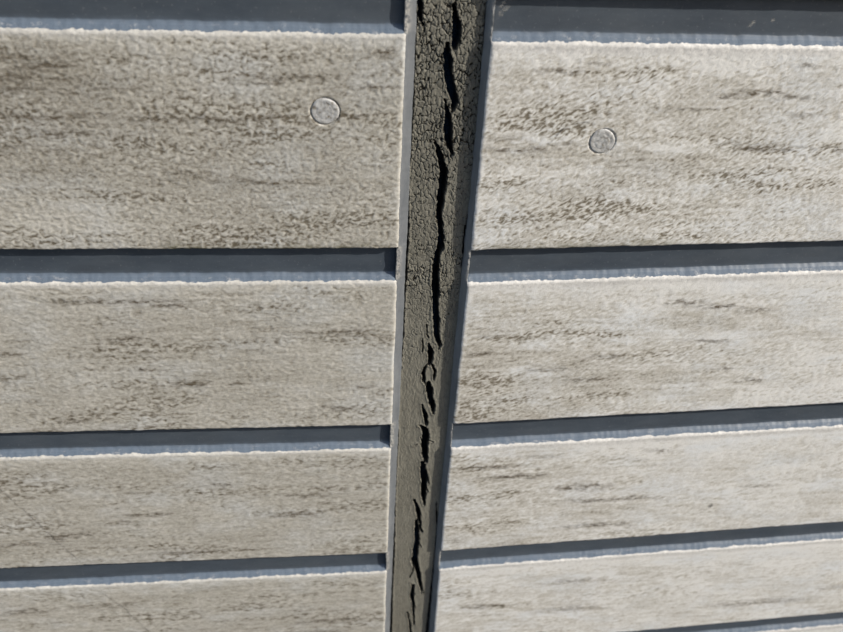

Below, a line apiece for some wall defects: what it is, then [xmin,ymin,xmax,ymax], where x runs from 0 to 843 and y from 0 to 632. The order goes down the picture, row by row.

crack [390,0,486,632]